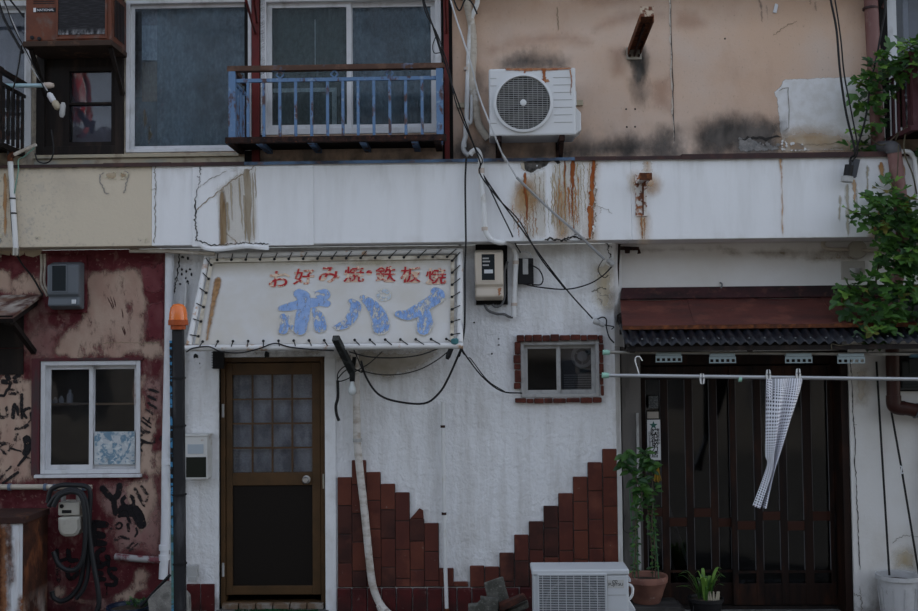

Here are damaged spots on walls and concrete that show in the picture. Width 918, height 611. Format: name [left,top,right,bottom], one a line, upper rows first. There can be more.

leakage [630,48,646,83]
leakage [700,118,868,153]
crack [151,166,159,242]
crack [174,166,268,294]
rust [512,173,538,235]
rust [551,160,595,238]
peeling [0,269,42,295]
peeling [25,262,165,359]
peeling [0,375,32,482]
peeling [103,375,162,557]
peeling [94,569,148,609]